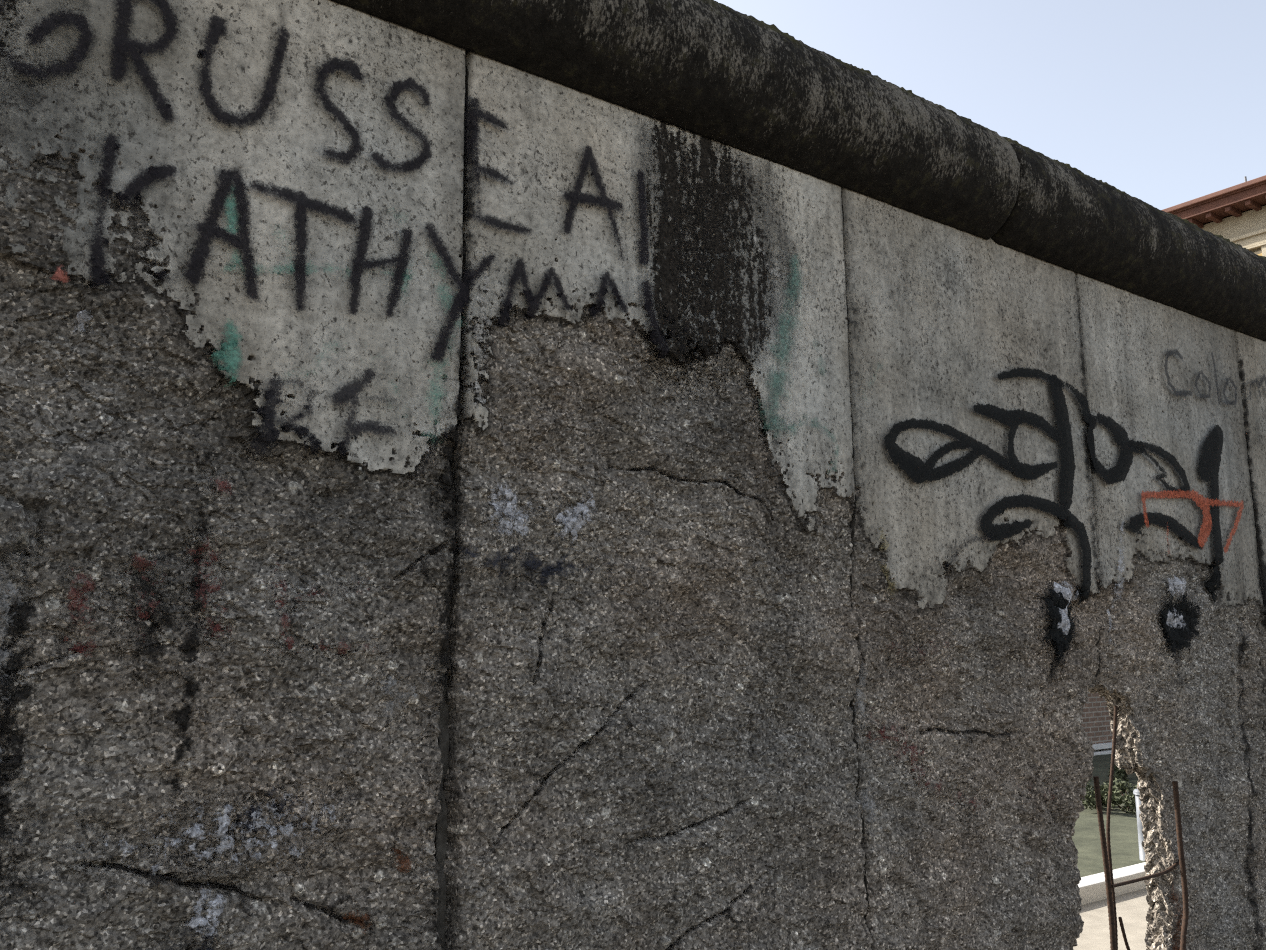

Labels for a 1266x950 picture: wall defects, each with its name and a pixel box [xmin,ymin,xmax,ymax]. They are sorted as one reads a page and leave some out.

leakage [0,0,23,57]
spalling [0,141,455,950]
leakage [433,134,592,685]
leakage [642,121,791,388]
spalling [443,292,1266,950]
leakage [1082,417,1101,589]